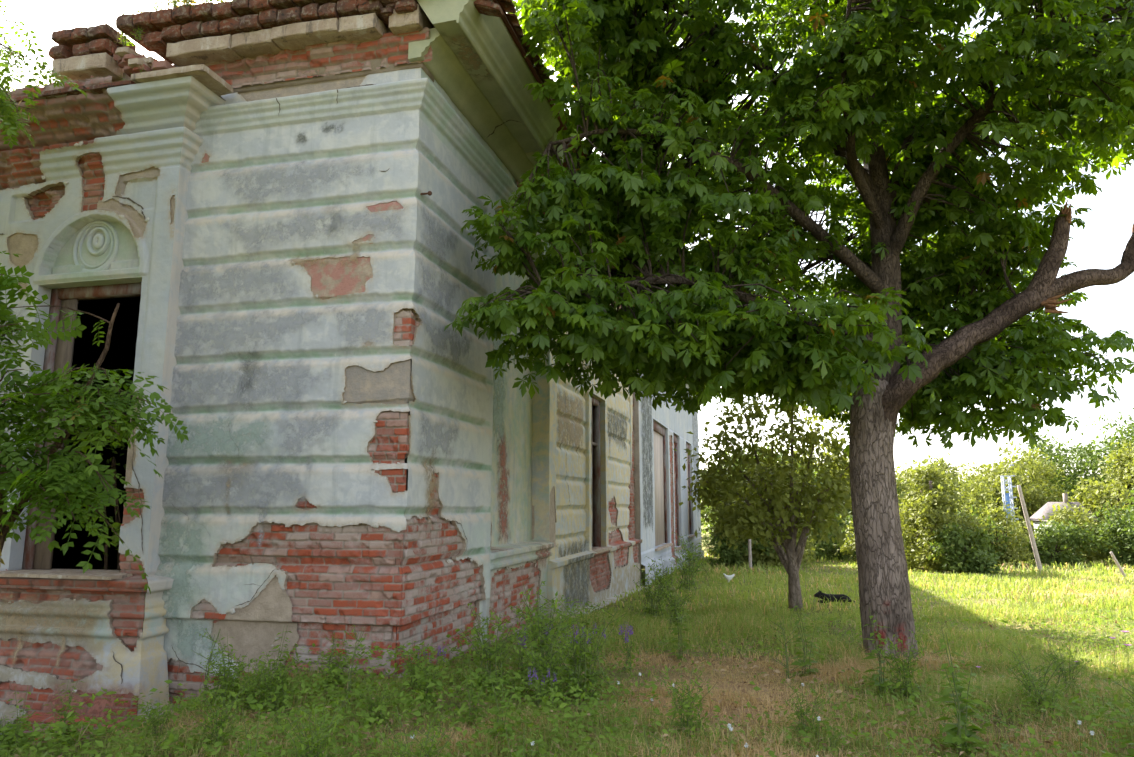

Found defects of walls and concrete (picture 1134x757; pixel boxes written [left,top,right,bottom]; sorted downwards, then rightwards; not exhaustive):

spalling [0,75,160,238]
peeling [8,233,39,268]
peeling [291,234,375,300]
peeling [341,309,420,493]
spalling [0,553,148,651]
spalling [191,473,539,685]
spalling [0,638,138,746]
spalling [167,658,221,712]